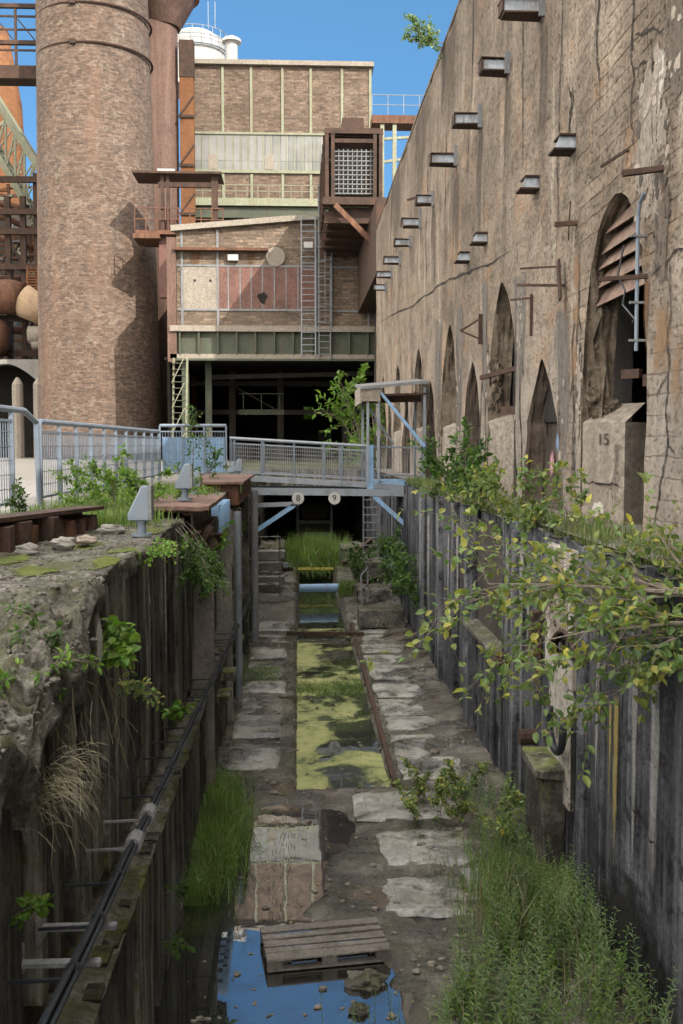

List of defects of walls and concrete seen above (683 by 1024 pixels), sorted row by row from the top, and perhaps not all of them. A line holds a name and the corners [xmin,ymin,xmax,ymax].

crack [380,127,509,323]
crack [593,0,601,113]
spalling [630,0,683,282]
crack [651,248,683,535]